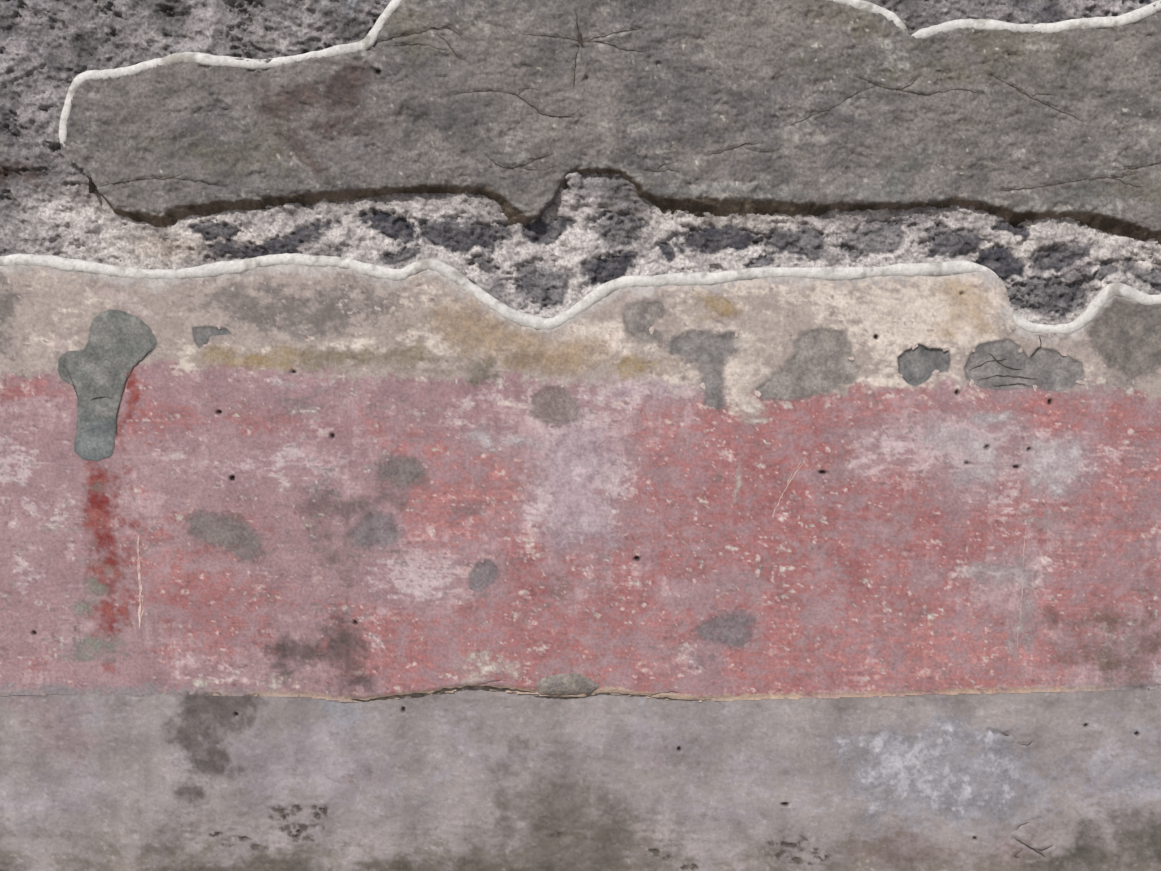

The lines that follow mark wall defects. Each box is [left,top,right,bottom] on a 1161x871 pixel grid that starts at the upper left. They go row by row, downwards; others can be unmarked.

crack [375,26,459,56]
crack [523,11,647,85]
crack [458,88,586,118]
crack [789,73,1081,126]
peeling [192,325,231,348]
peeling [623,300,859,424]
spalling [897,344,950,386]
peeling [955,336,1085,404]
peeling [1089,298,1161,374]
crack [352,680,530,702]
crack [588,691,713,701]
damp [177,694,257,772]